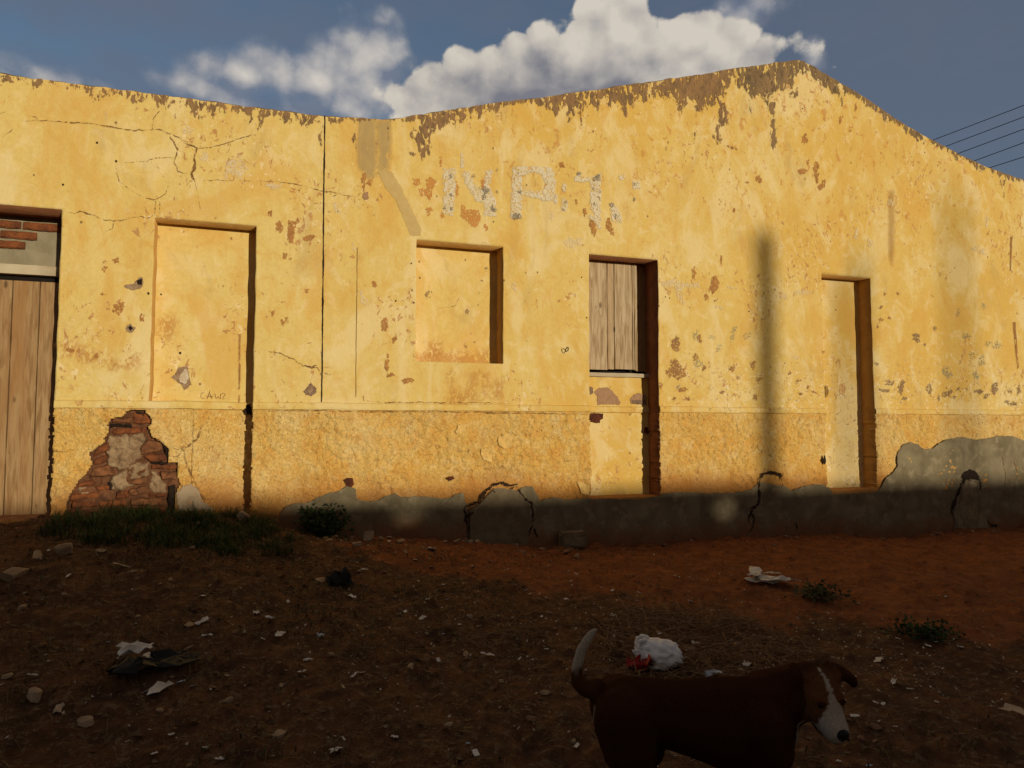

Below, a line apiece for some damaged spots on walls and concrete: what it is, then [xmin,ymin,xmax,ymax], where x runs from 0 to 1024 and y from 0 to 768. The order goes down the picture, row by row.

water stain [352,120,390,177]
peeling [401,68,740,167]
flaking render [124,277,143,290]
crack [10,113,579,414]
flaking render [171,366,191,390]
flaking render [590,387,647,423]
peeling [659,326,752,401]
flaking render [67,410,212,516]
crack [463,481,538,537]
crack [747,470,783,533]
peeling [520,436,1024,546]
crack [951,457,1018,515]